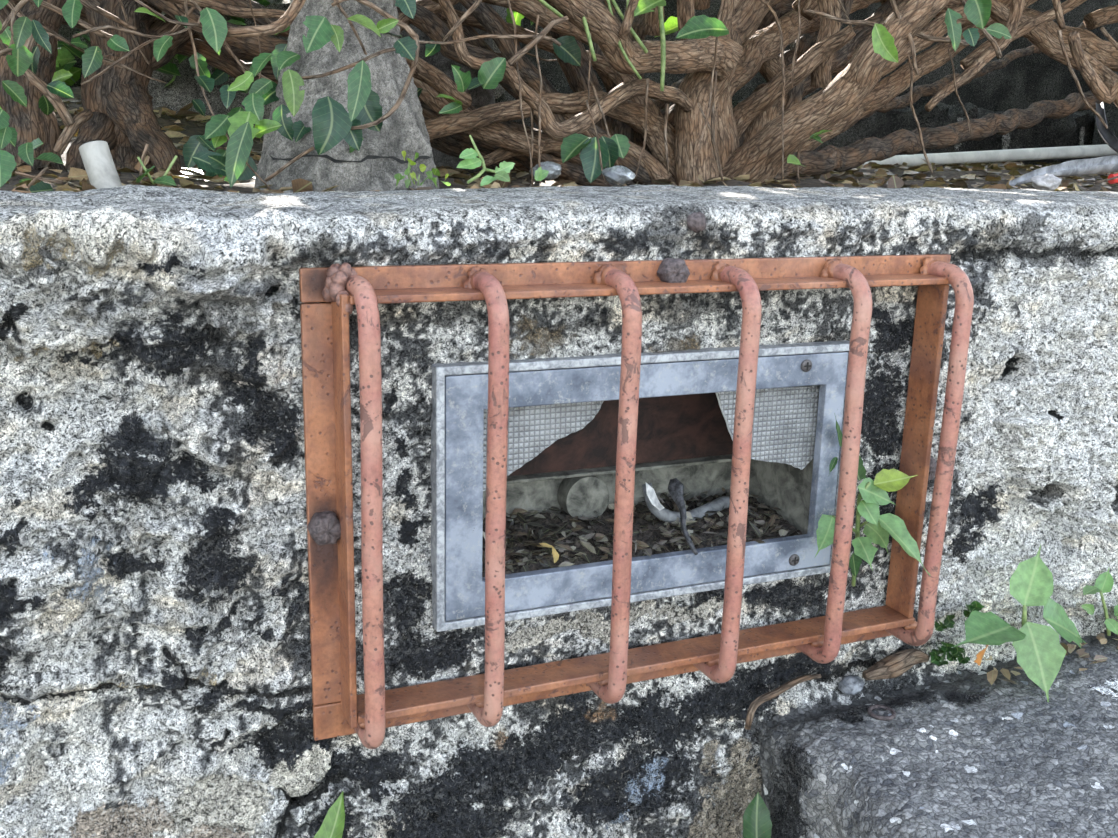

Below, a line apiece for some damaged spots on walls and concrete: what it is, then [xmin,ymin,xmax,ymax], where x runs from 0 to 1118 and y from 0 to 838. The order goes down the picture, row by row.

leakage [21,223,125,278]
leakage [137,251,207,277]
leakage [4,311,215,382]
leakage [208,339,302,469]
leakage [0,498,28,558]
leakage [59,412,870,838]
leakage [0,580,44,743]
leakage [0,754,19,785]